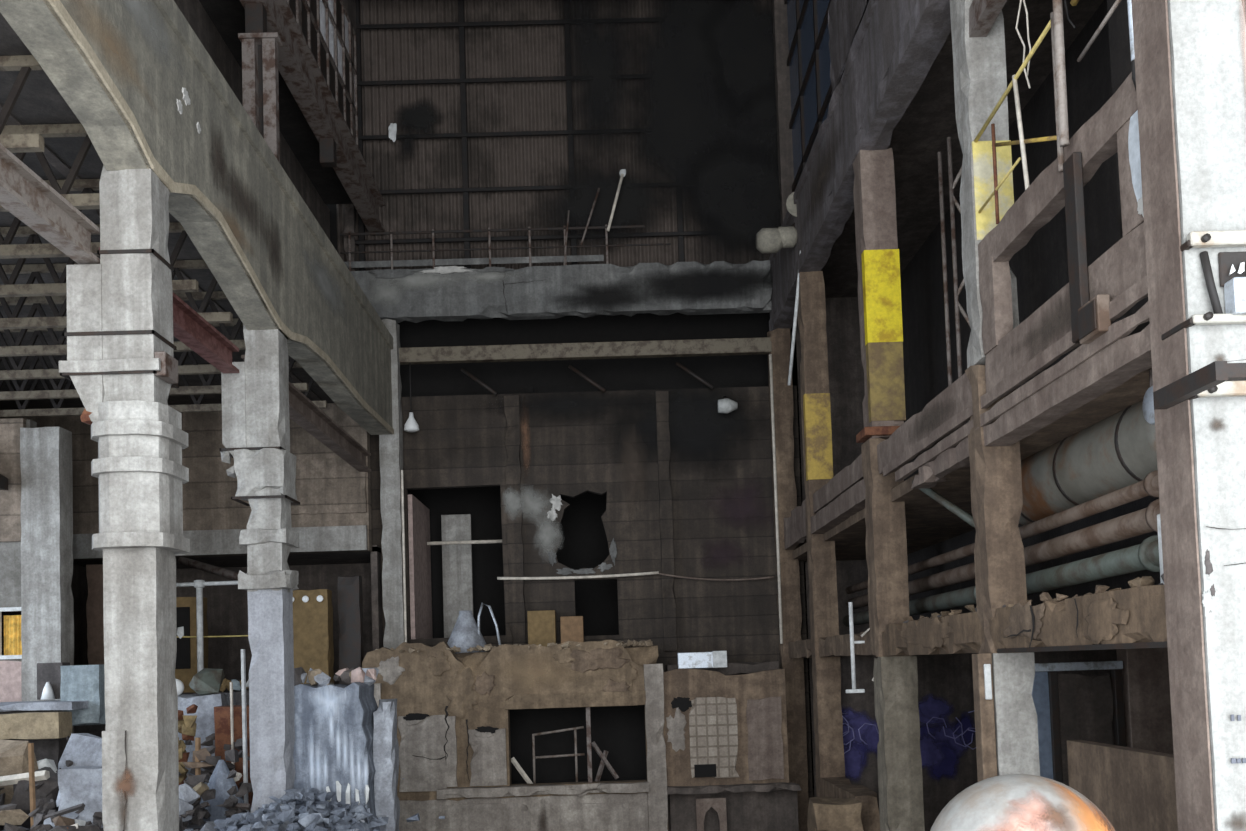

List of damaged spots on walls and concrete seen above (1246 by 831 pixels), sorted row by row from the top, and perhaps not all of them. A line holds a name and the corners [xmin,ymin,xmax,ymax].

leakage [706,0,776,110]
spalling [176,87,191,114]
leakage [692,147,781,245]
leakage [569,287,638,309]
peeling [506,492,618,576]
spalling [1003,600,1045,639]
spalling [1085,597,1129,644]
spalling [377,656,405,685]
crack [412,706,470,782]
spalling [474,726,499,738]
corrosion [117,770,134,823]